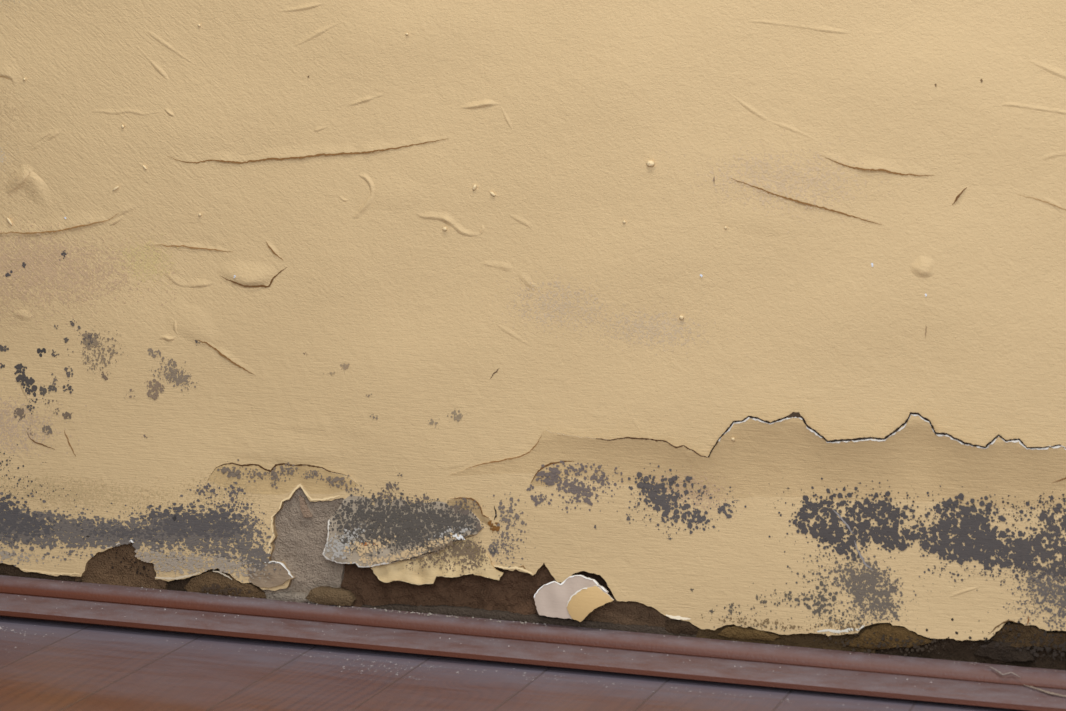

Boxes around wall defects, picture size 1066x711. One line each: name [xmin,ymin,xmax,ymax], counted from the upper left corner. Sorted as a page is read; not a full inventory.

damp [0,75,750,582]
peeling [449,412,1066,514]
peeling [0,540,232,591]
peeling [208,464,1066,670]
damp [695,478,1066,634]